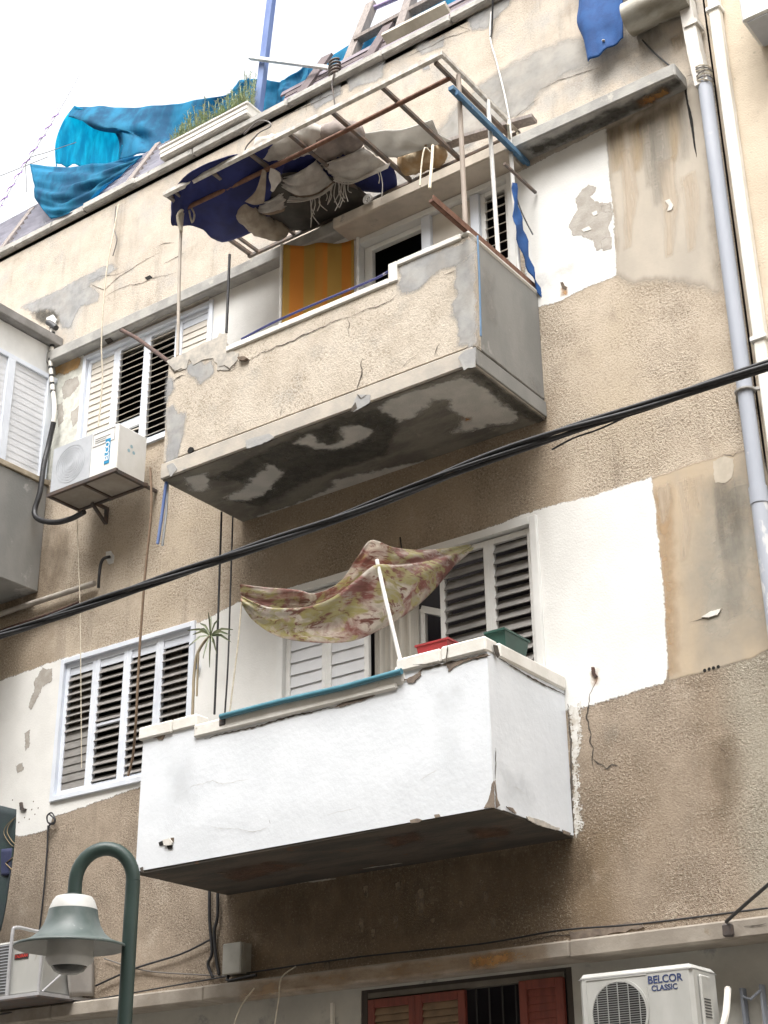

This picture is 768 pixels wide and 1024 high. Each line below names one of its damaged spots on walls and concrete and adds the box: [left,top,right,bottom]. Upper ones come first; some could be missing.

peeling [569,185,613,251]
spalling [167,333,249,381]
damp [473,374,544,422]
damp [213,410,397,506]
peeling [29,668,52,709]
crack [204,695,375,739]
crack [404,645,617,772]
peeling [484,702,584,837]